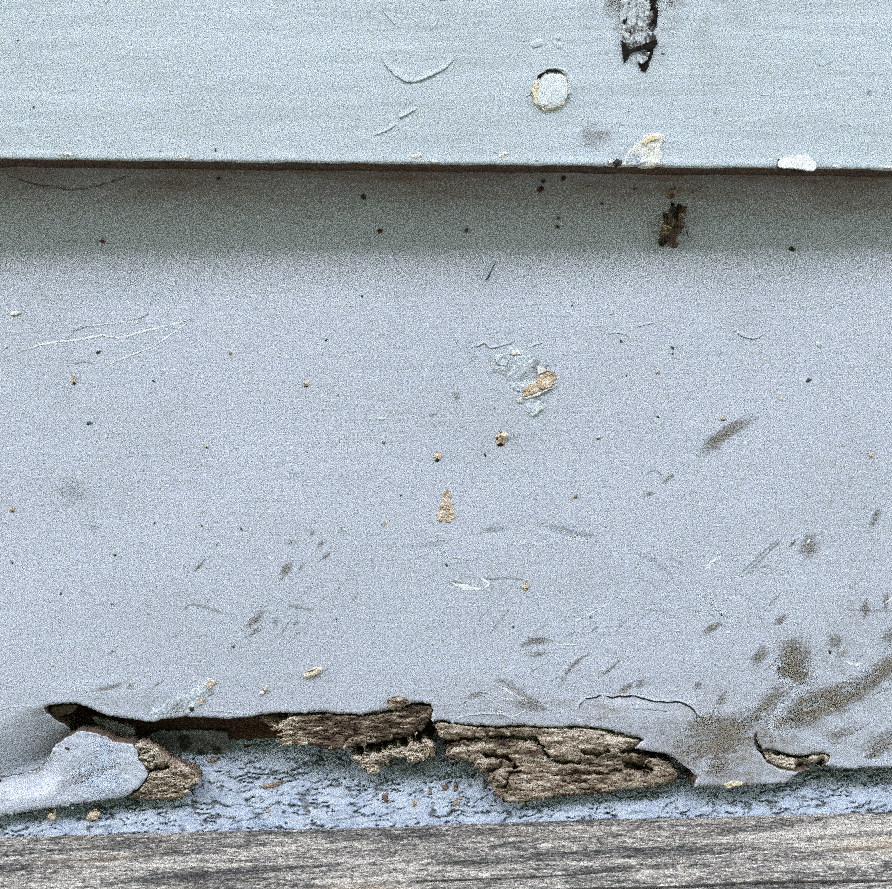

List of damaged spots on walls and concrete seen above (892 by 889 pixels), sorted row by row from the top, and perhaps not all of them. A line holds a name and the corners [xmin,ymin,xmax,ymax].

spalling [613,0,659,72]
peeling [608,133,666,169]
peeling [488,347,560,417]
peeling [149,677,219,715]
crack [575,692,707,721]
peeling [0,733,892,838]